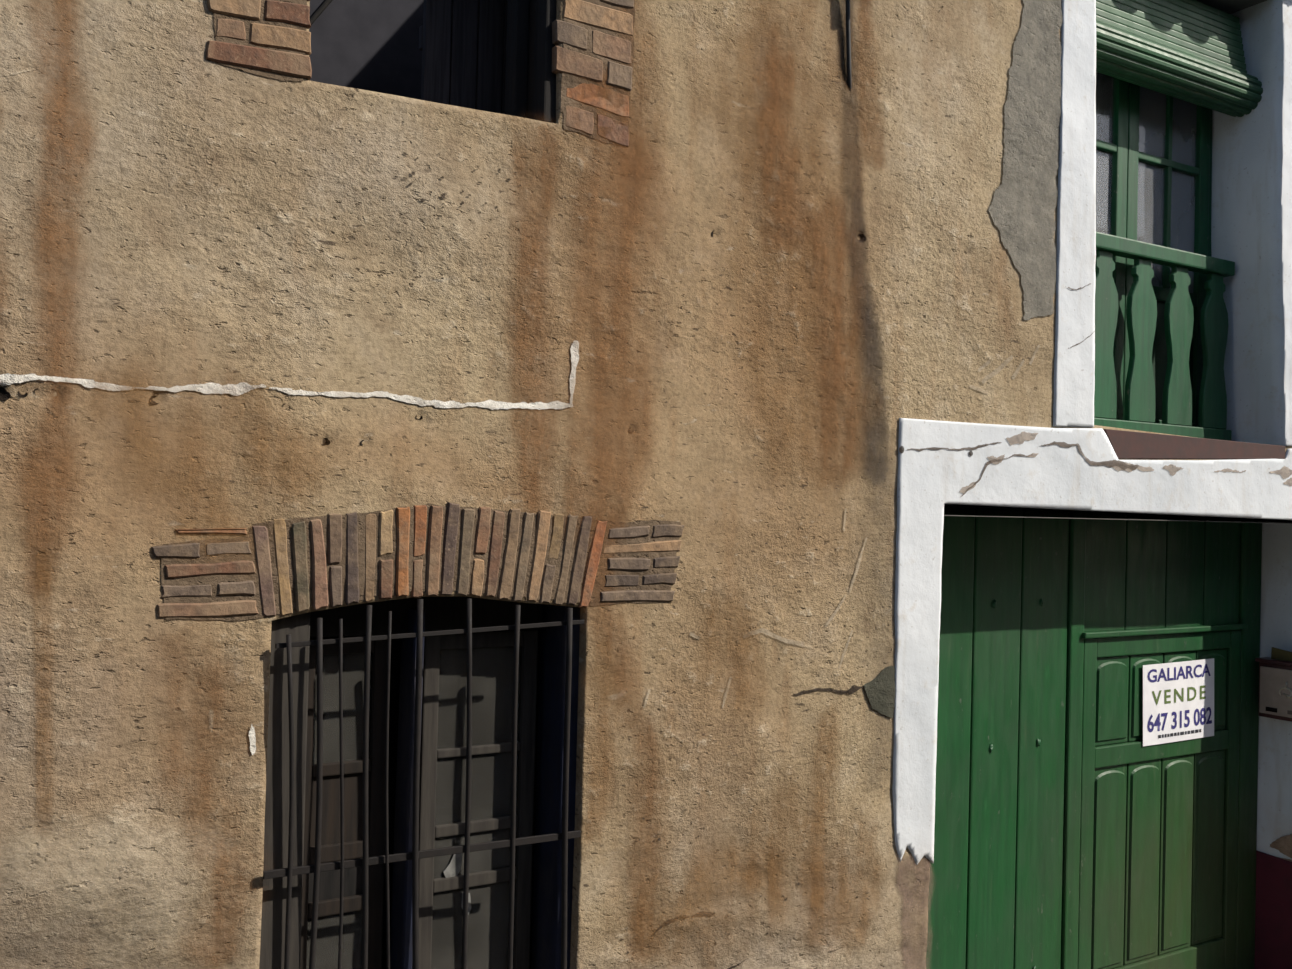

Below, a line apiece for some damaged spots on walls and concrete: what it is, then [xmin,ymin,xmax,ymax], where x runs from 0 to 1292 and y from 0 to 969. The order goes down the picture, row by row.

crack [0,340,579,410]
crack [899,441,1154,497]
flaking render [793,666,895,719]
peeling [1270,834,1292,862]